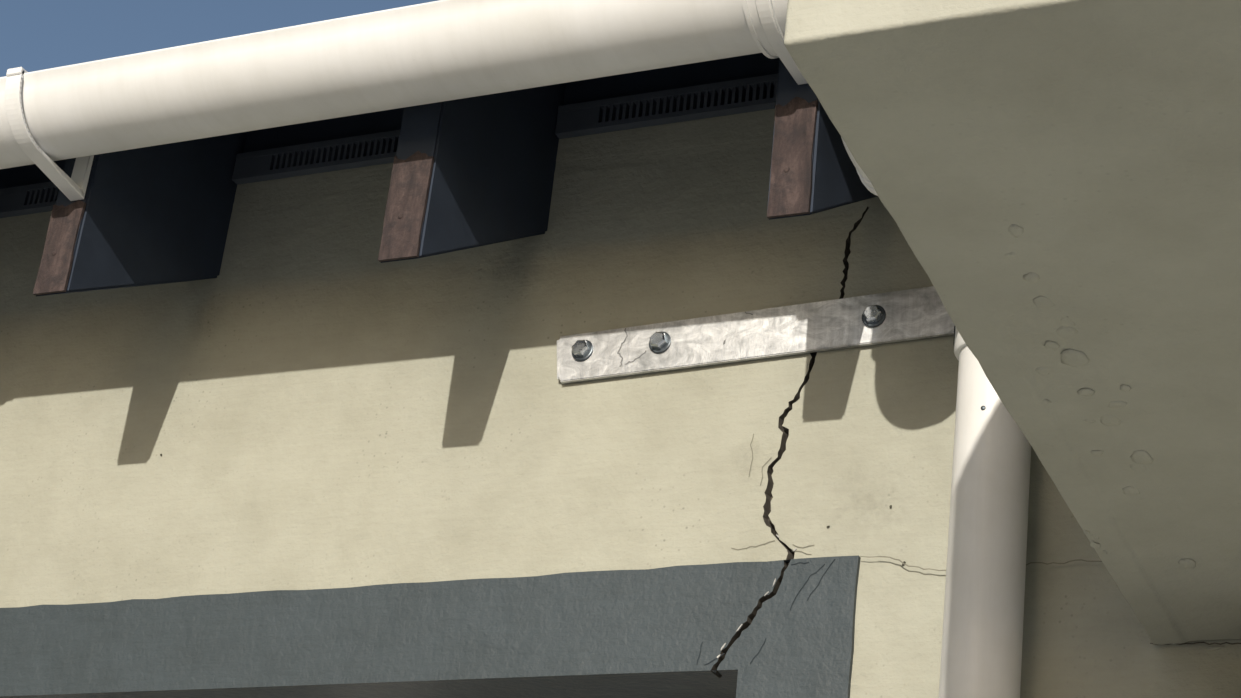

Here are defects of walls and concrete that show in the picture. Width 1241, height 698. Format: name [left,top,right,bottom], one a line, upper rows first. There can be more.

crack [839,206,869,299]
crack [697,352,946,678]